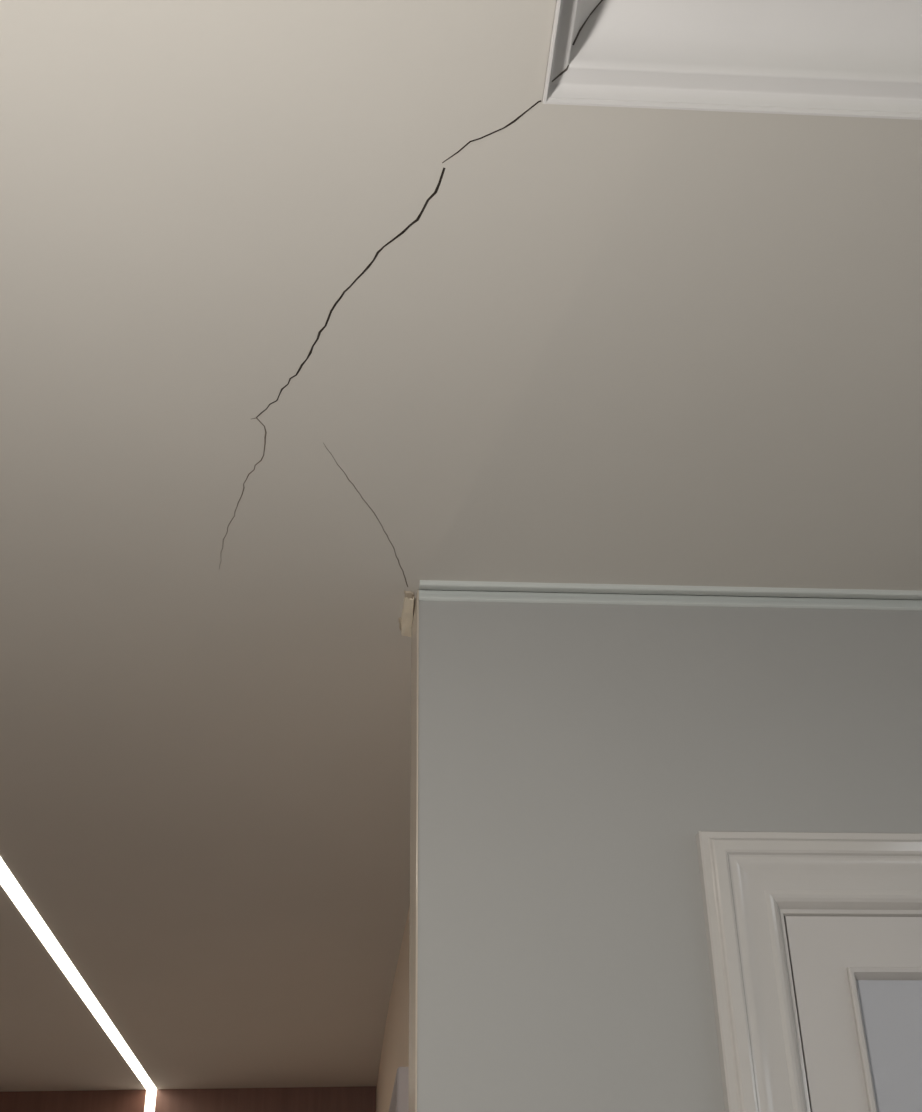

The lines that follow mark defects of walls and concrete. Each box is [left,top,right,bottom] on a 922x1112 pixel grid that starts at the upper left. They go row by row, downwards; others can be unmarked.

crack [219,0,603,587]